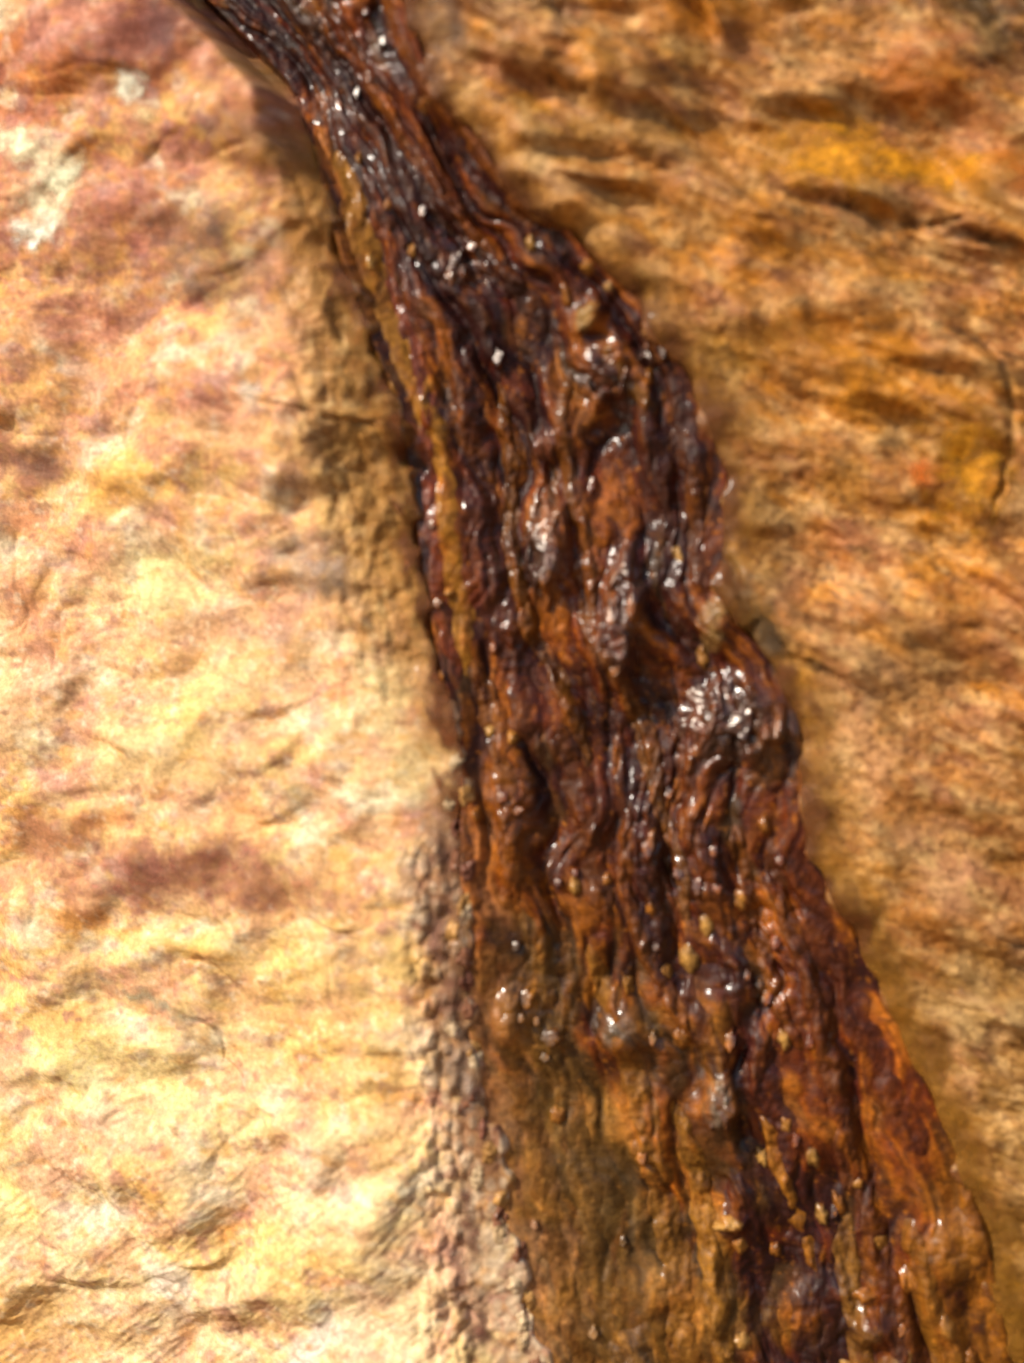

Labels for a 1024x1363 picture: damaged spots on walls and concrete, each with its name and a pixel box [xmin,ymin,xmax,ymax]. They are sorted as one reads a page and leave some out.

rust [779,123,982,188]
rust [916,424,1011,510]
rust [199,0,909,1363]
rust [74,849,182,899]
rust [695,738,1024,1363]